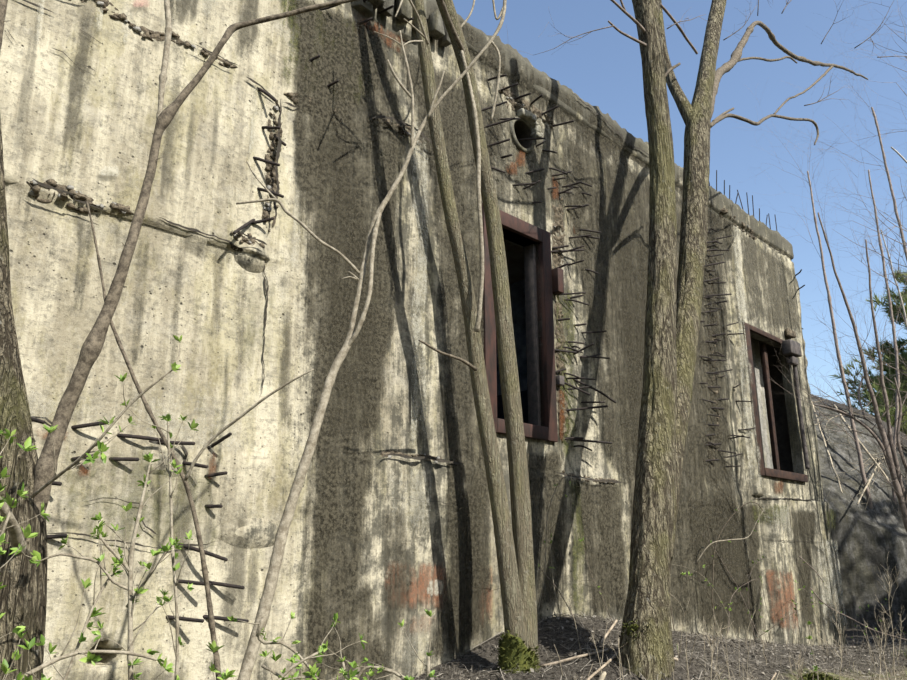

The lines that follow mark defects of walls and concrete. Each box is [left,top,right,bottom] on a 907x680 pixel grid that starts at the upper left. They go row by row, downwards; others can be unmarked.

spalling [81,0,238,68]
spalling [27,178,134,214]
crack [156,215,243,252]
spalling [231,87,312,248]
crack [261,265,269,394]
water stain [281,0,491,680]
water stain [461,22,650,615]
water stain [670,201,846,632]